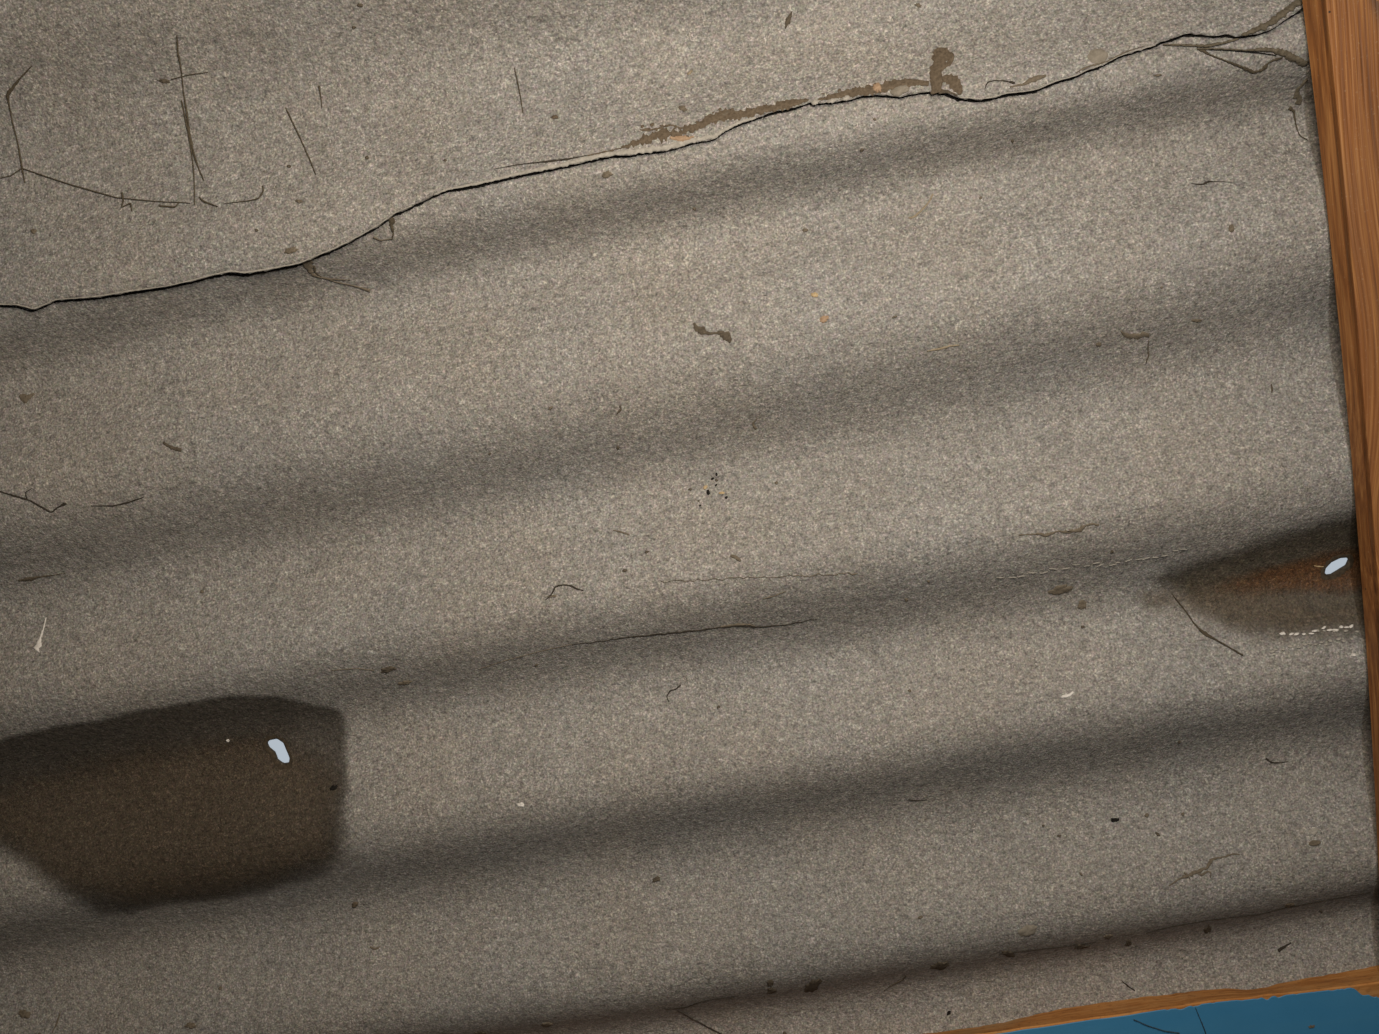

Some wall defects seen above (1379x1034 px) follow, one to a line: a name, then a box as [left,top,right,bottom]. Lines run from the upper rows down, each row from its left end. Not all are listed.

crack [0,11,1301,312]
leakage [0,697,344,911]